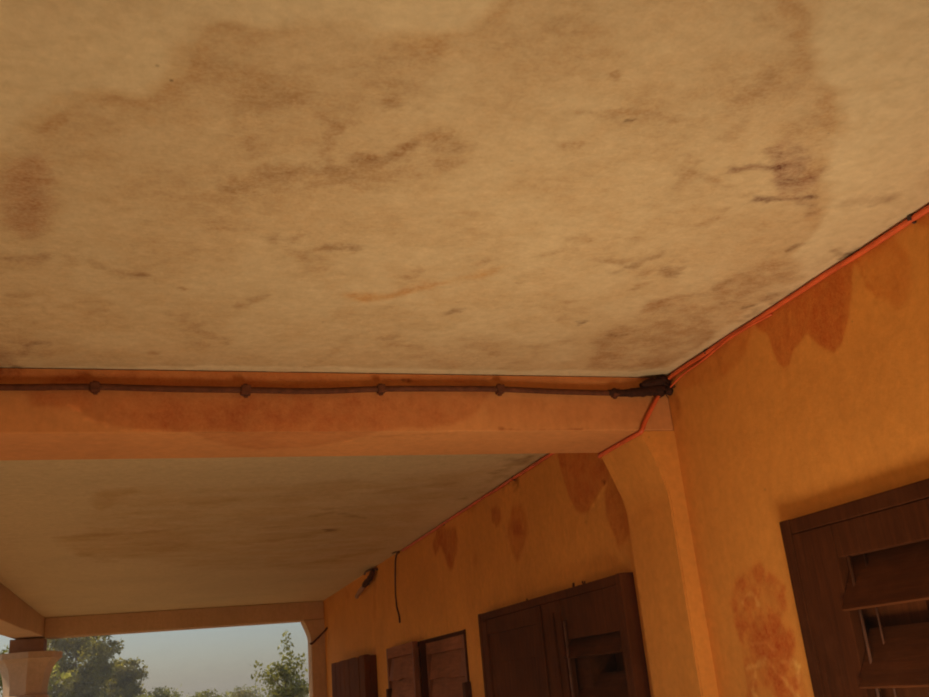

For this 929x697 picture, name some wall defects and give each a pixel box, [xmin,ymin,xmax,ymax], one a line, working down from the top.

water stain [0,0,929,432]
water stain [44,453,631,575]